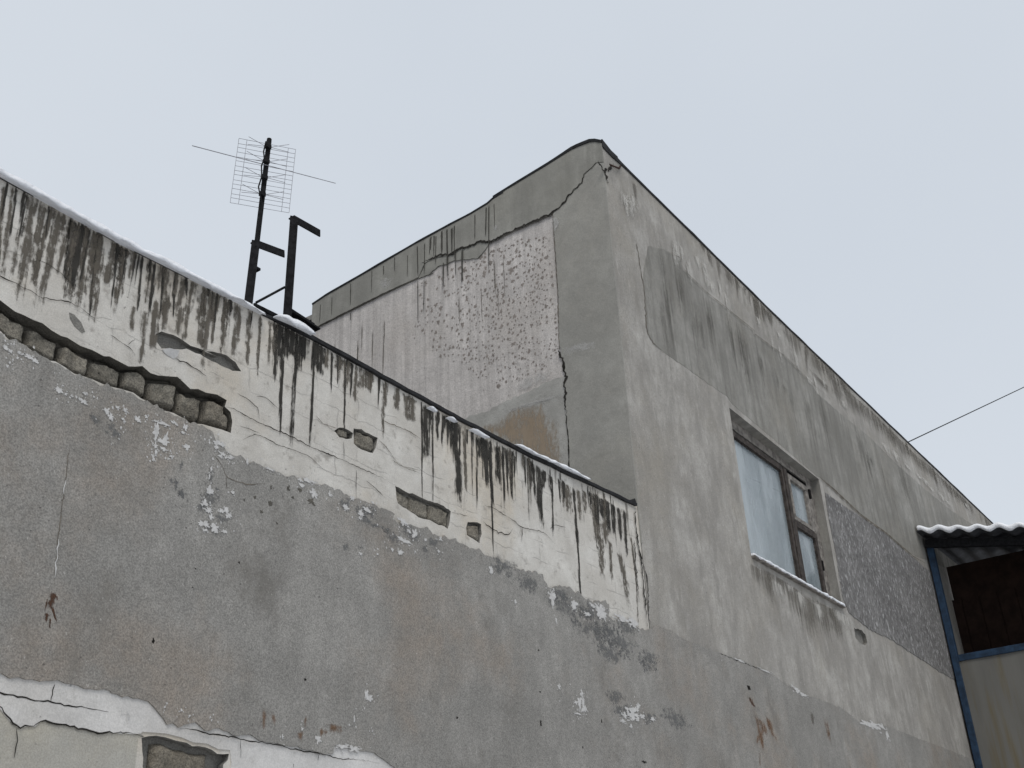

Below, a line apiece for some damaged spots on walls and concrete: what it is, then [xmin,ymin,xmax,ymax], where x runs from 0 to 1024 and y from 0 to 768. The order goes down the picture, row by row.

crack [54,445,70,582]
spalling [0,301,451,562]
water stain [0,182,639,622]
crack [319,162,614,467]
water stain [673,244,772,323]
water stain [772,332,991,525]
corrosion [45,593,58,628]
peeling [0,674,393,768]